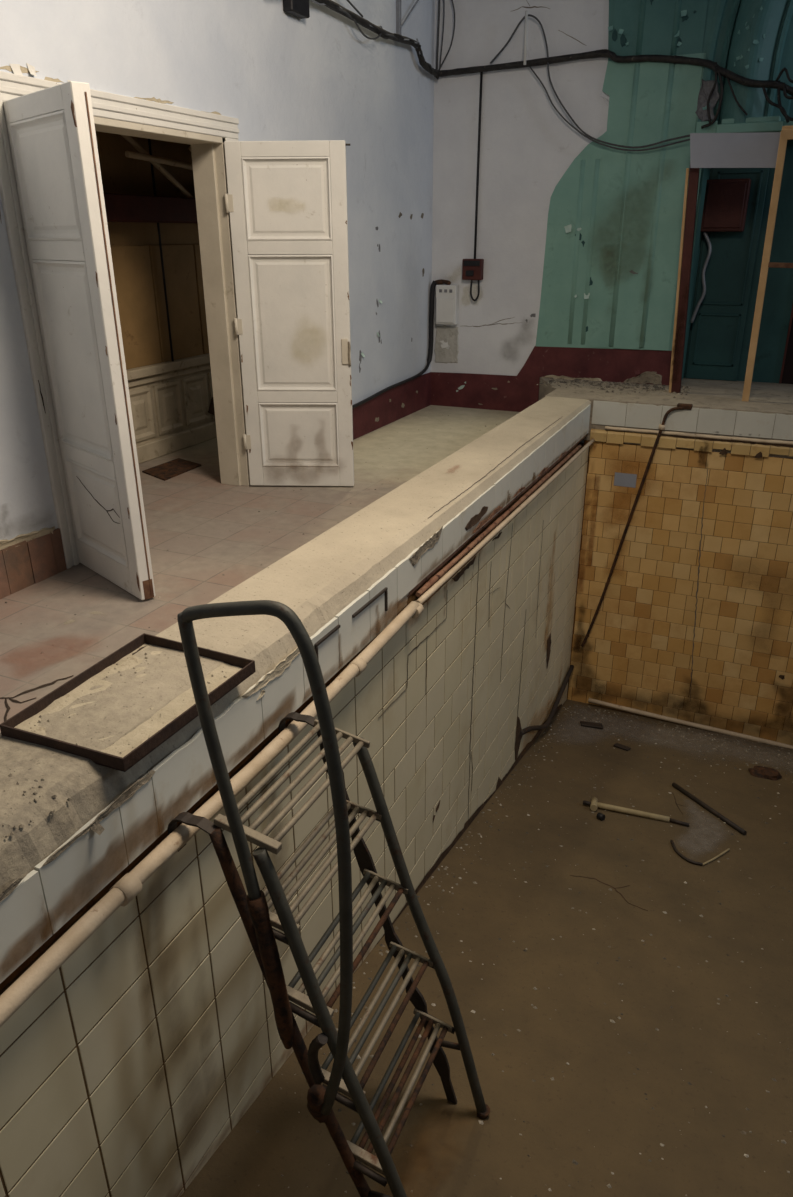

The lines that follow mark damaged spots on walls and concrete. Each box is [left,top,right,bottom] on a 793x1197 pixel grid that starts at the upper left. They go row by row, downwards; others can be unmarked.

spalling [409,526,443,566]